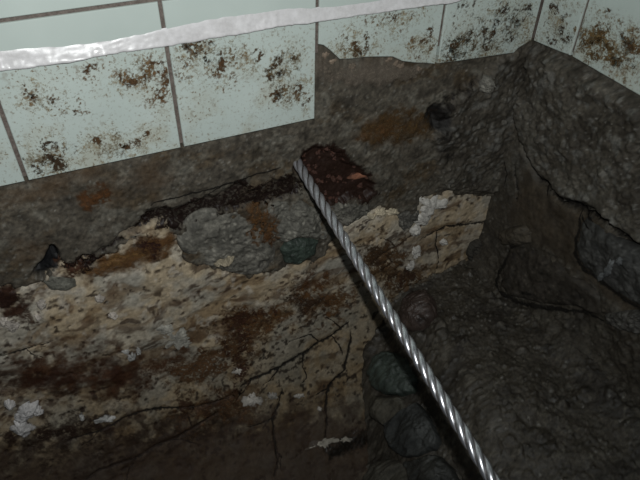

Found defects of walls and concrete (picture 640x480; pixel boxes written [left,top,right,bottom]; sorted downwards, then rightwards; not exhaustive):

corrosion [111,56,171,104]
corrosion [178,41,264,84]
corrosion [265,47,312,110]
corrosion [545,3,640,79]
crack [57,166,307,274]
spalling [301,143,491,303]
efflorescence [406,245,421,271]
efflorescence [409,195,450,236]
crack [541,178,640,309]
spalling [0,214,385,480]
leakage [0,392,369,480]
crack [67,317,352,479]